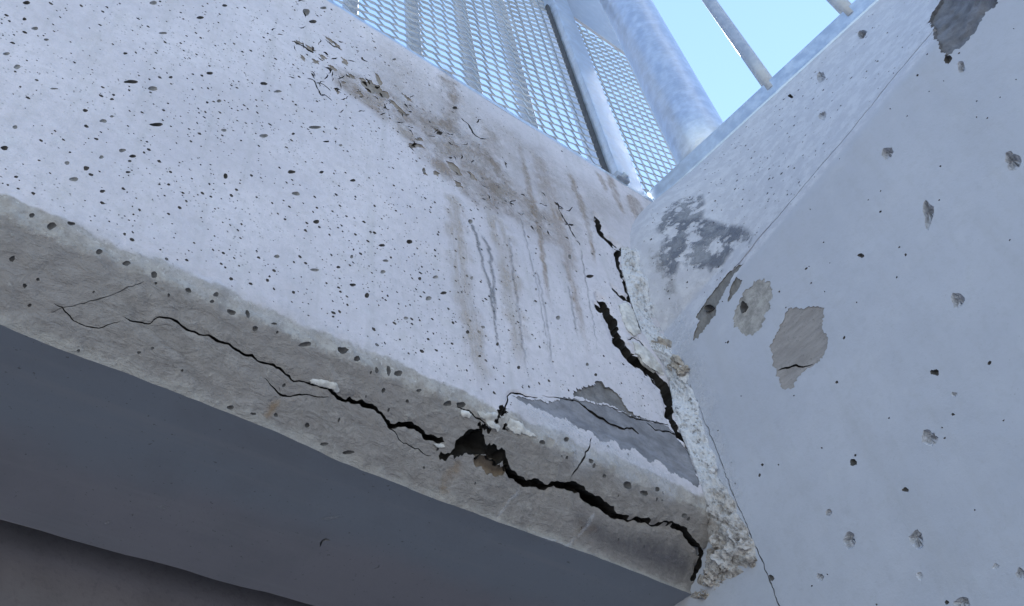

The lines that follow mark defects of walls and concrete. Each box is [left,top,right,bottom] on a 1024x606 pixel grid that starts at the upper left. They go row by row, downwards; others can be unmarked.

spalling [928,0,998,73]
water stain [399,106,549,234]
crack [54,281,444,456]
water stain [459,223,517,338]
crack [272,0,780,606]
peeling [693,264,773,340]
peeling [769,306,828,390]
spalling [514,381,700,487]